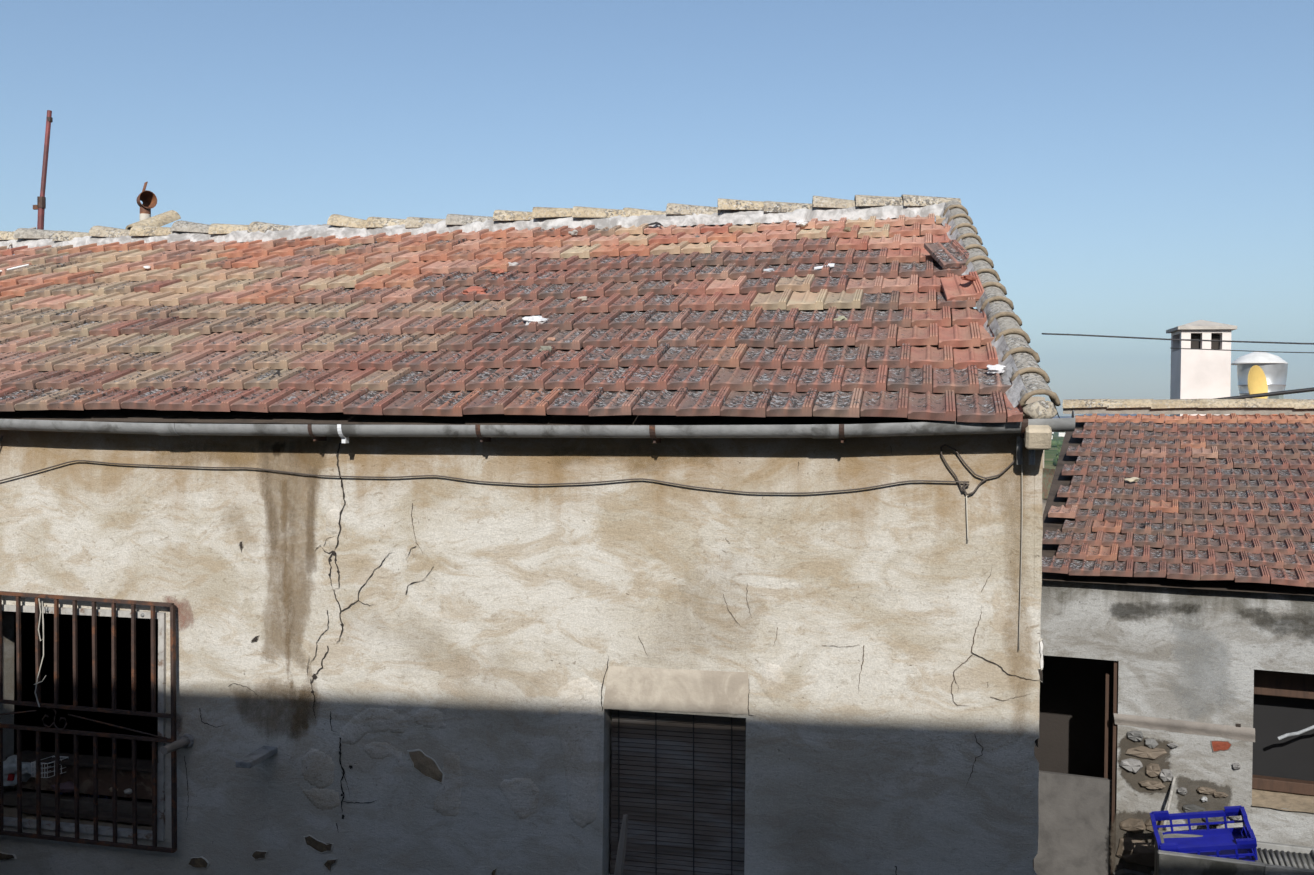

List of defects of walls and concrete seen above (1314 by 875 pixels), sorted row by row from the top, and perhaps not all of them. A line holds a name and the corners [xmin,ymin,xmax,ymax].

water stain [262,443,323,653]
rust [167,598,191,628]
water stain [1112,604,1159,618]
crack [307,443,434,829]
crack [951,570,1040,706]
flaking render [1211,740,1233,752]
flaking render [407,749,444,784]